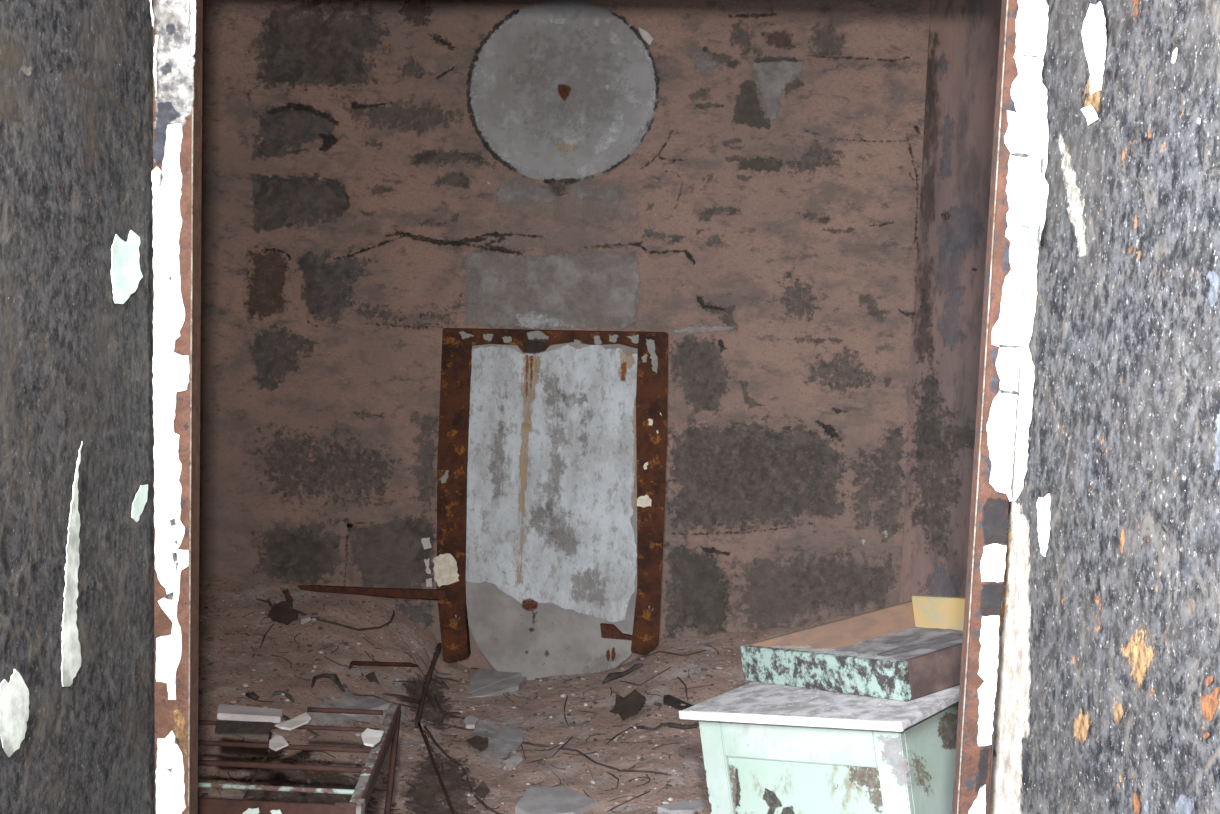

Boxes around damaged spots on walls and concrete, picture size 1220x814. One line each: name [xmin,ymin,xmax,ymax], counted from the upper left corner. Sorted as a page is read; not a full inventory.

crack [334,231,544,260]
crack [584,241,696,265]
peeling [111,0,196,700]
peeling [244,0,899,638]
rust [518,338,547,549]
peeling [968,0,1051,814]
peeling [61,441,83,687]
rust [522,598,538,632]
rust [1122,624,1154,691]
peeling [0,669,29,757]
rust [1074,710,1092,744]
rust [1112,702,1124,724]